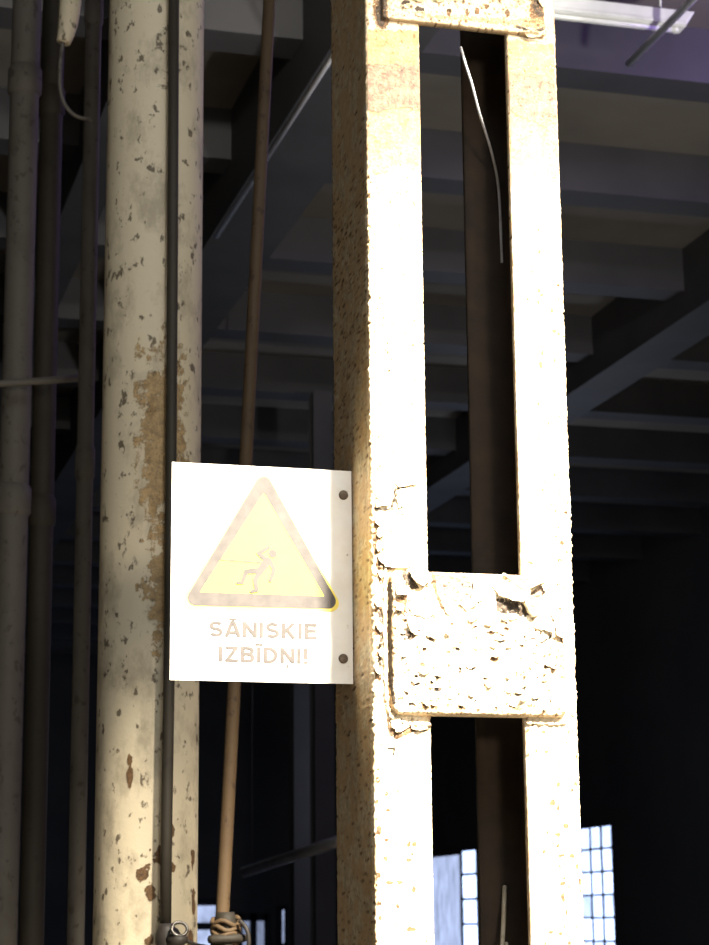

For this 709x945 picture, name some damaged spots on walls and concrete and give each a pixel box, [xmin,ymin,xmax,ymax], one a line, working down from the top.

crack [374,479,418,516]
peeling [373,519,389,584]
peeling [374,598,384,680]
peeling [396,564,567,710]